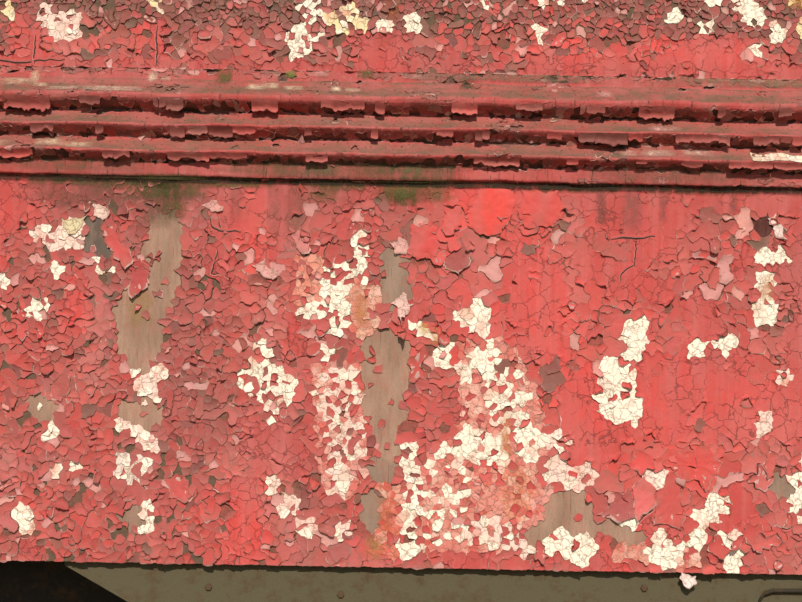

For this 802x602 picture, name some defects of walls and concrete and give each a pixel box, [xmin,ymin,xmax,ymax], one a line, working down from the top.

peeling [0,0,802,190]
crack [611,233,655,283]
peeling [0,176,802,589]